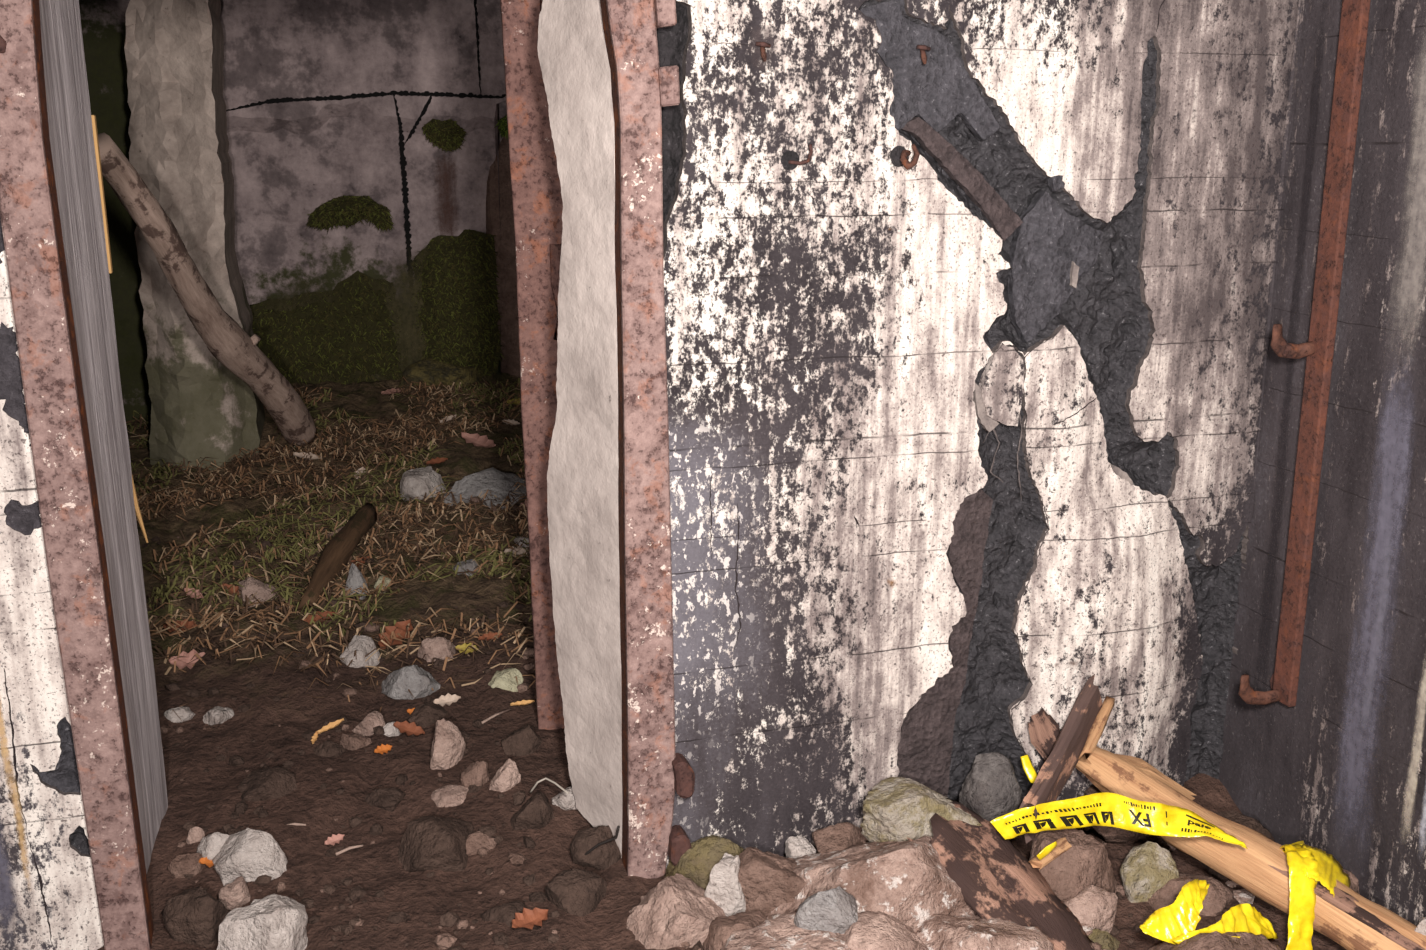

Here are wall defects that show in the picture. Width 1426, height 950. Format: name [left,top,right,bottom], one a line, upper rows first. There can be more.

corrosion [438,159,455,234]
crack [656,0,692,260]
leakage [1398,54,1426,317]
peeling [0,322,31,447]
peeling [4,499,42,535]
crack [709,471,741,652]
leakage [1338,386,1412,824]
spalling [30,717,81,795]
spalling [69,826,91,857]
efflorescence [1406,670,1426,844]